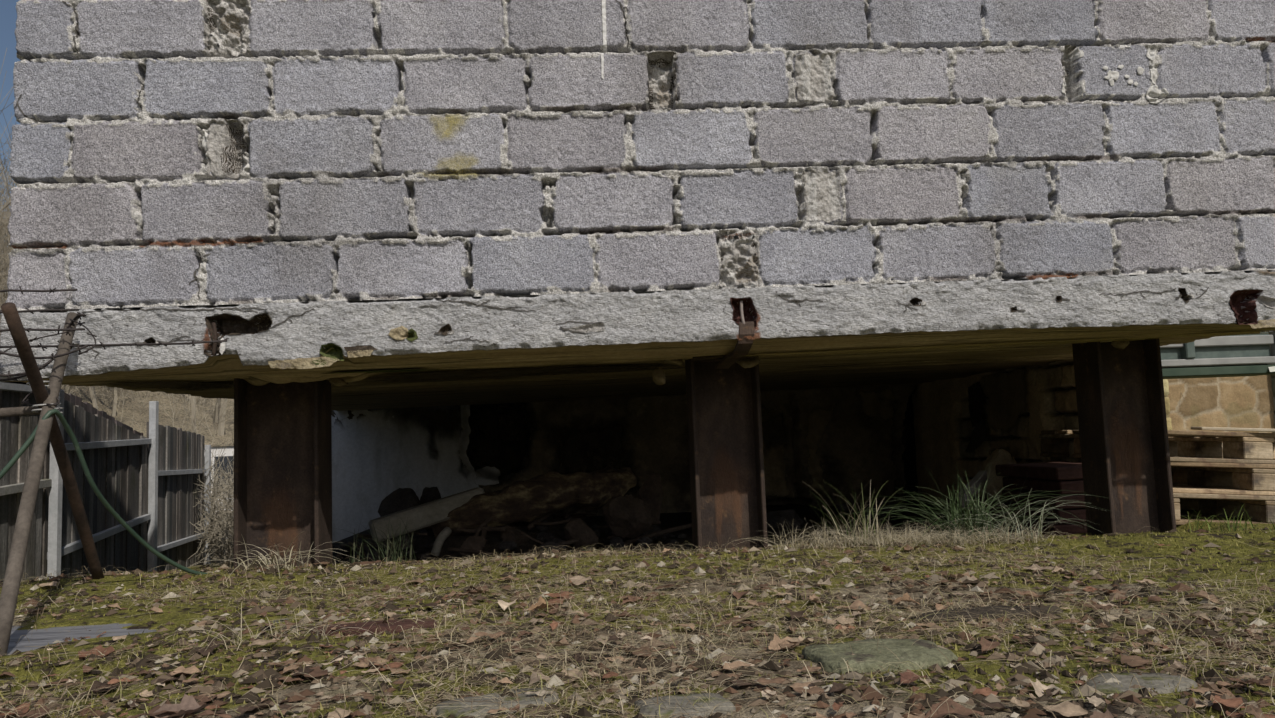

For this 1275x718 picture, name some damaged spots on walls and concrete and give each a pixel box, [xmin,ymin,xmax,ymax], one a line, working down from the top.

spalling [203,313,272,356]